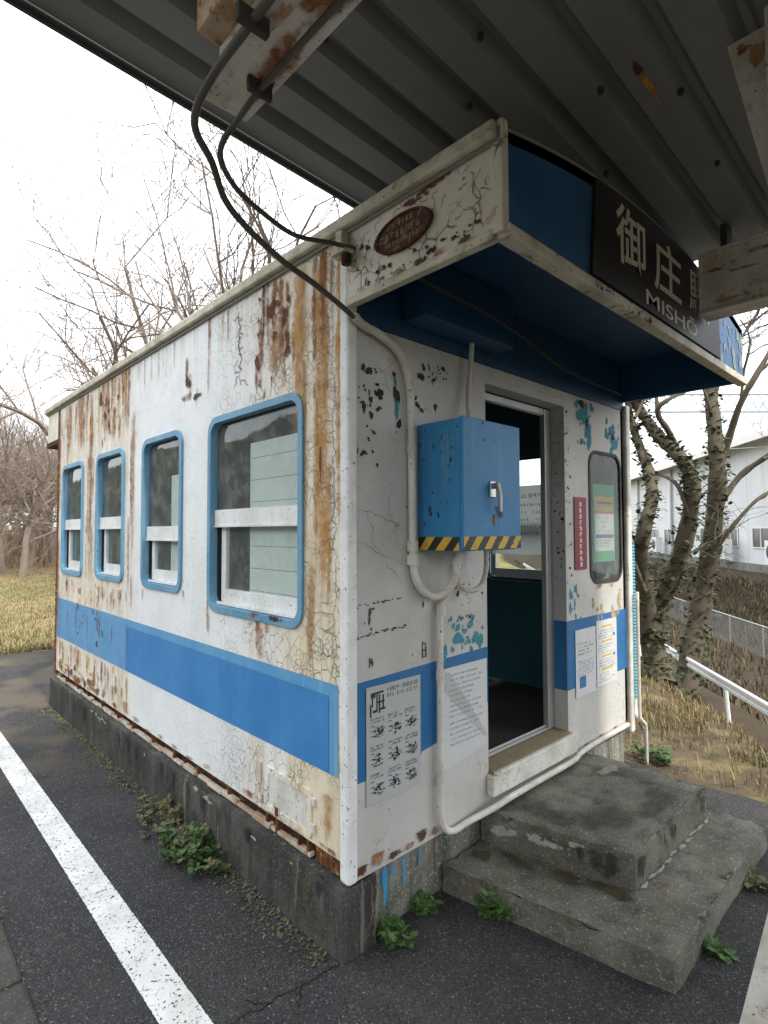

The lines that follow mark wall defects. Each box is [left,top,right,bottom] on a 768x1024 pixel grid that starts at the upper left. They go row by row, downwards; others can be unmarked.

peeling [354,219,481,286]
crack [362,171,492,275]
crack [234,286,297,402]
rust [56,370,143,622]
rust [255,248,340,650]
peeling [357,363,401,467]
peeling [605,418,619,454]
peeling [443,583,484,666]
rust [59,642,161,739]
rust [357,827,437,877]
damp [490,825,617,878]
damp [640,797,708,888]